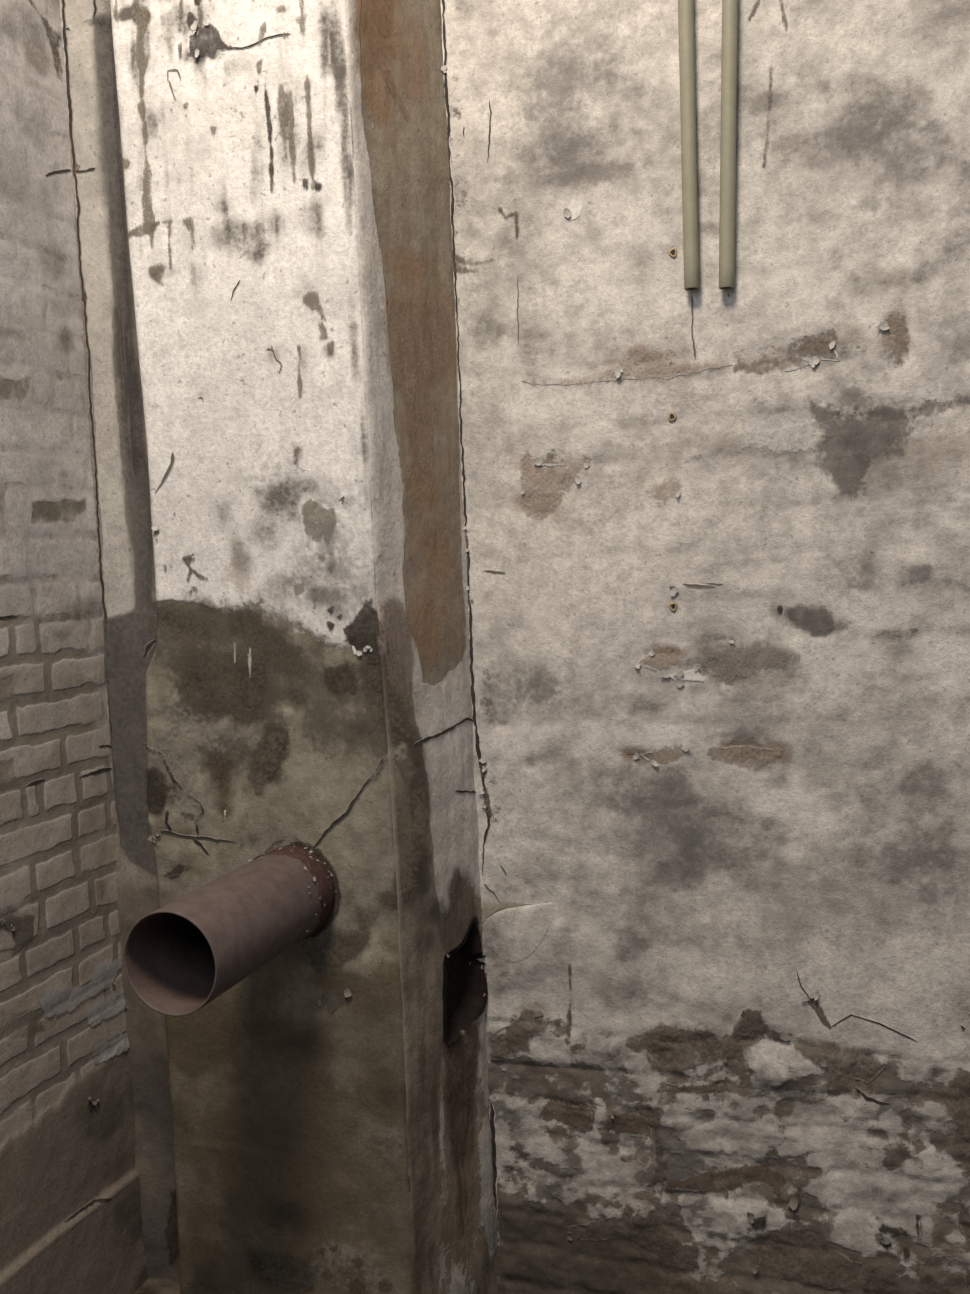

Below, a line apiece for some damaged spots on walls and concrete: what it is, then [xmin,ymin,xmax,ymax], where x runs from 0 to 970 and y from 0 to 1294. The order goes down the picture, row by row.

flaking render [178,12,290,58]
crack [45,0,108,633]
crack [268,345,282,373]
water stain [96,0,429,905]
crack [314,0,507,903]
water stain [810,398,967,493]
crack [143,743,235,855]
flaking render [443,916,488,1048]
peeling [489,1009,547,1063]
peeling [644,970,918,1098]
crack [489,1101,500,1245]
peeling [540,1098,950,1294]